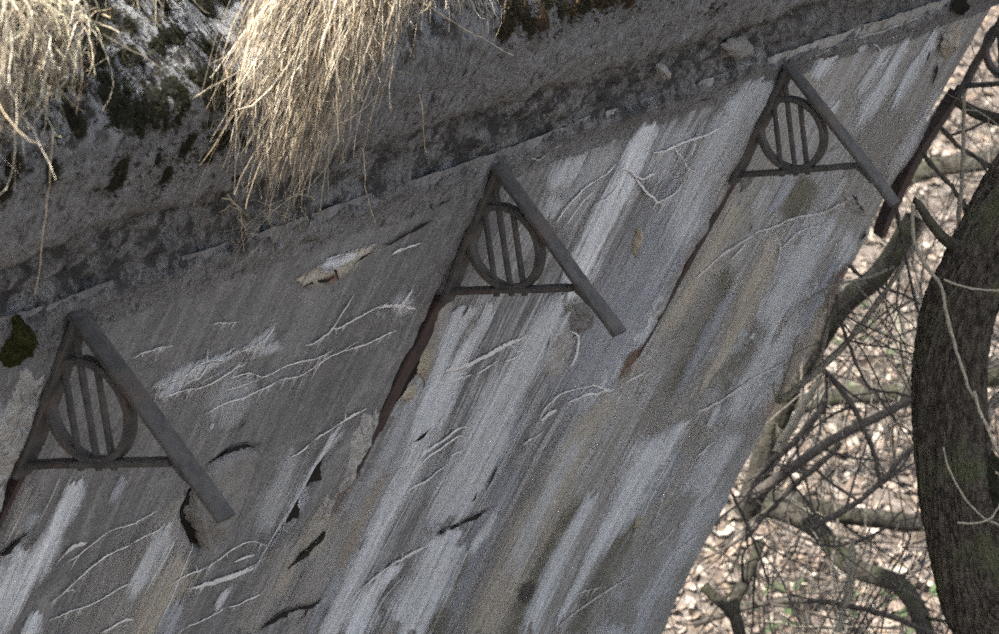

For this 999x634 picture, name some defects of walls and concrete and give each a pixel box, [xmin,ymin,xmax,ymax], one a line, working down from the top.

leakage [812,55,840,81]
leakage [858,28,936,165]
crack [557,119,733,225]
leakage [0,479,86,634]
leakage [105,495,193,634]
spalling [189,447,259,550]
crack [153,289,416,463]
leakage [235,426,341,634]
crack [404,427,469,497]
crack [425,333,535,389]
leakage [287,77,863,634]
crack [522,369,649,446]